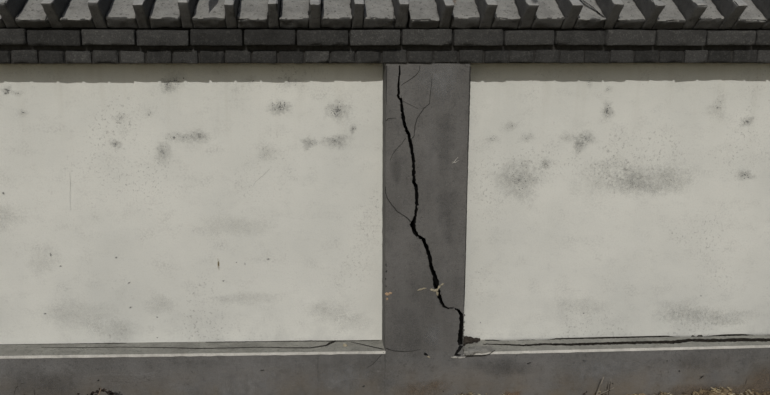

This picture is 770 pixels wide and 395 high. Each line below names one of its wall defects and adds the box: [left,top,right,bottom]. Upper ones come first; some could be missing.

crack [385,65,770,357]